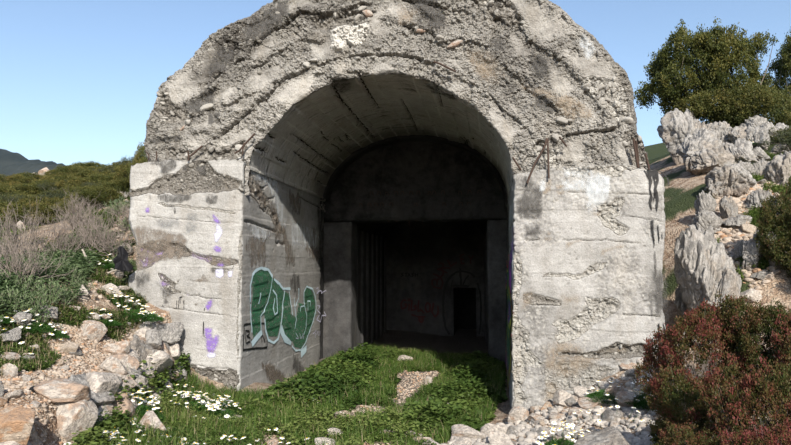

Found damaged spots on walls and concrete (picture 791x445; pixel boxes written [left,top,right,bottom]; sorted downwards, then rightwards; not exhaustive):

spalling [312,8,362,31]
spalling [471,0,527,32]
spalling [154,89,194,124]
crack [209,76,296,141]
crack [254,54,421,184]
spalling [581,75,632,122]
spalling [128,133,283,234]
spalling [512,130,650,184]
damp [644,170,669,211]
spalling [136,241,238,294]
spalling [511,252,659,408]
spalling [189,365,240,390]